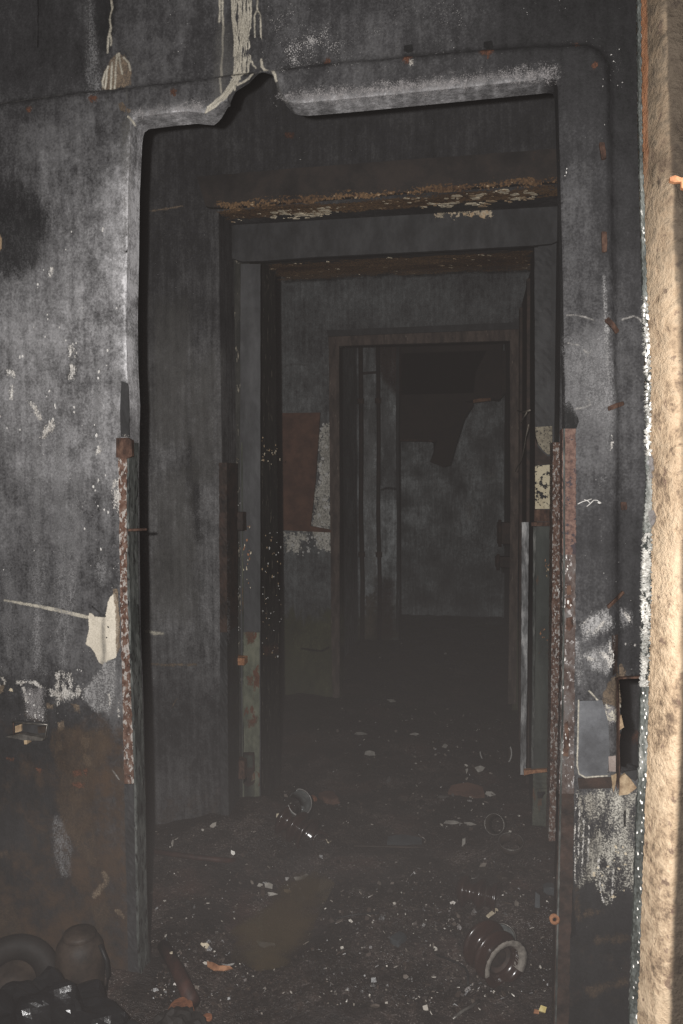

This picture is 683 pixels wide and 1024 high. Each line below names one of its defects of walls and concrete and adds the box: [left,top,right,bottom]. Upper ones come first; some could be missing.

flaking render [102,53,131,90]
leakage [127,0,559,126]
peeling [217,168,567,223]
peeling [262,423,331,622]
peeling [86,589,120,665]
peeling [0,669,85,722]
flaking render [603,664,626,730]
peeling [565,692,647,918]